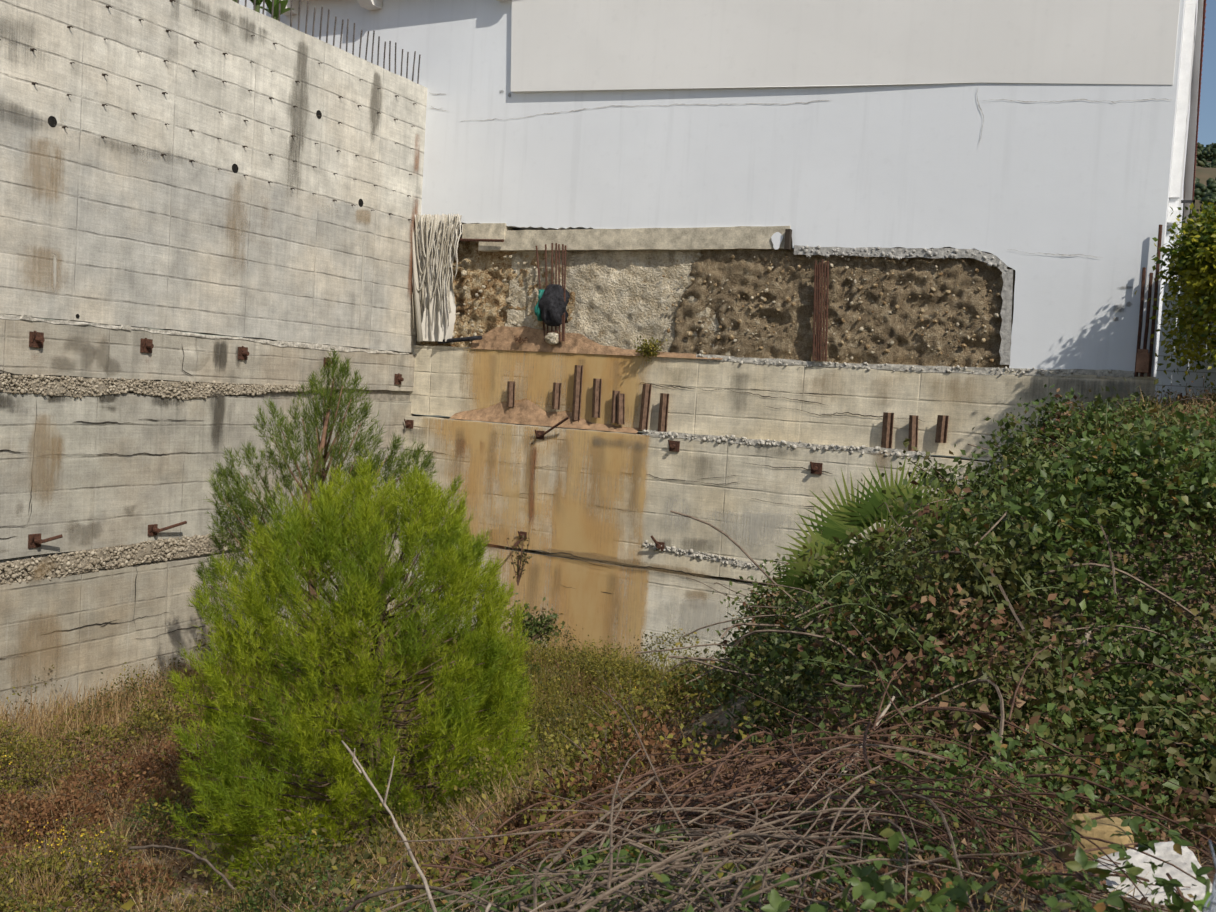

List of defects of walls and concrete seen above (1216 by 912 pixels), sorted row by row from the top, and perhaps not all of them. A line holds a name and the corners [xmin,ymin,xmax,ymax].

damp [291,44,307,161]
crack [427,93,829,122]
crack [976,90,1170,142]
spalling [534,243,570,341]
spalling [696,225,1162,379]
corrosion [435,349,649,664]